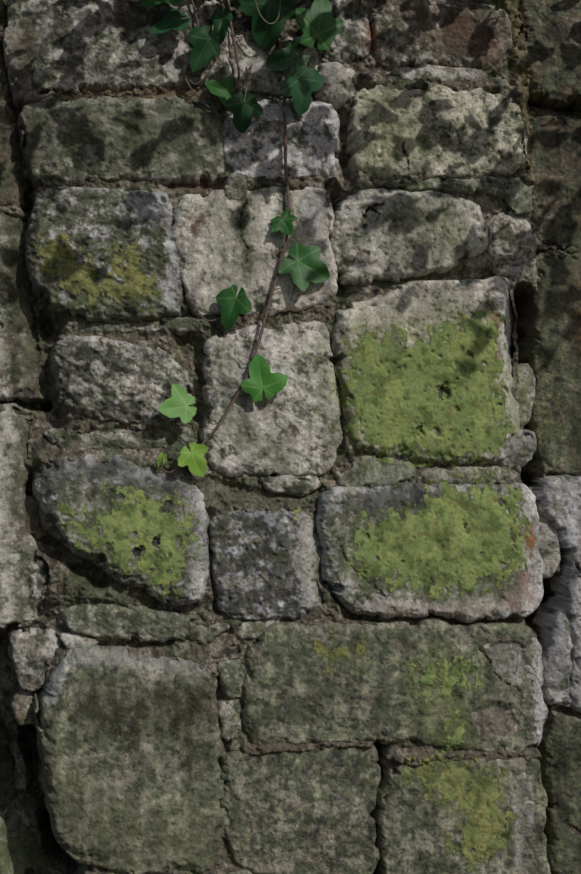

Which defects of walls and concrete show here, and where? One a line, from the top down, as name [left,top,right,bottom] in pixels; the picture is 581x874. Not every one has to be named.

crack [363,203,384,219]
crack [563,819,581,835]